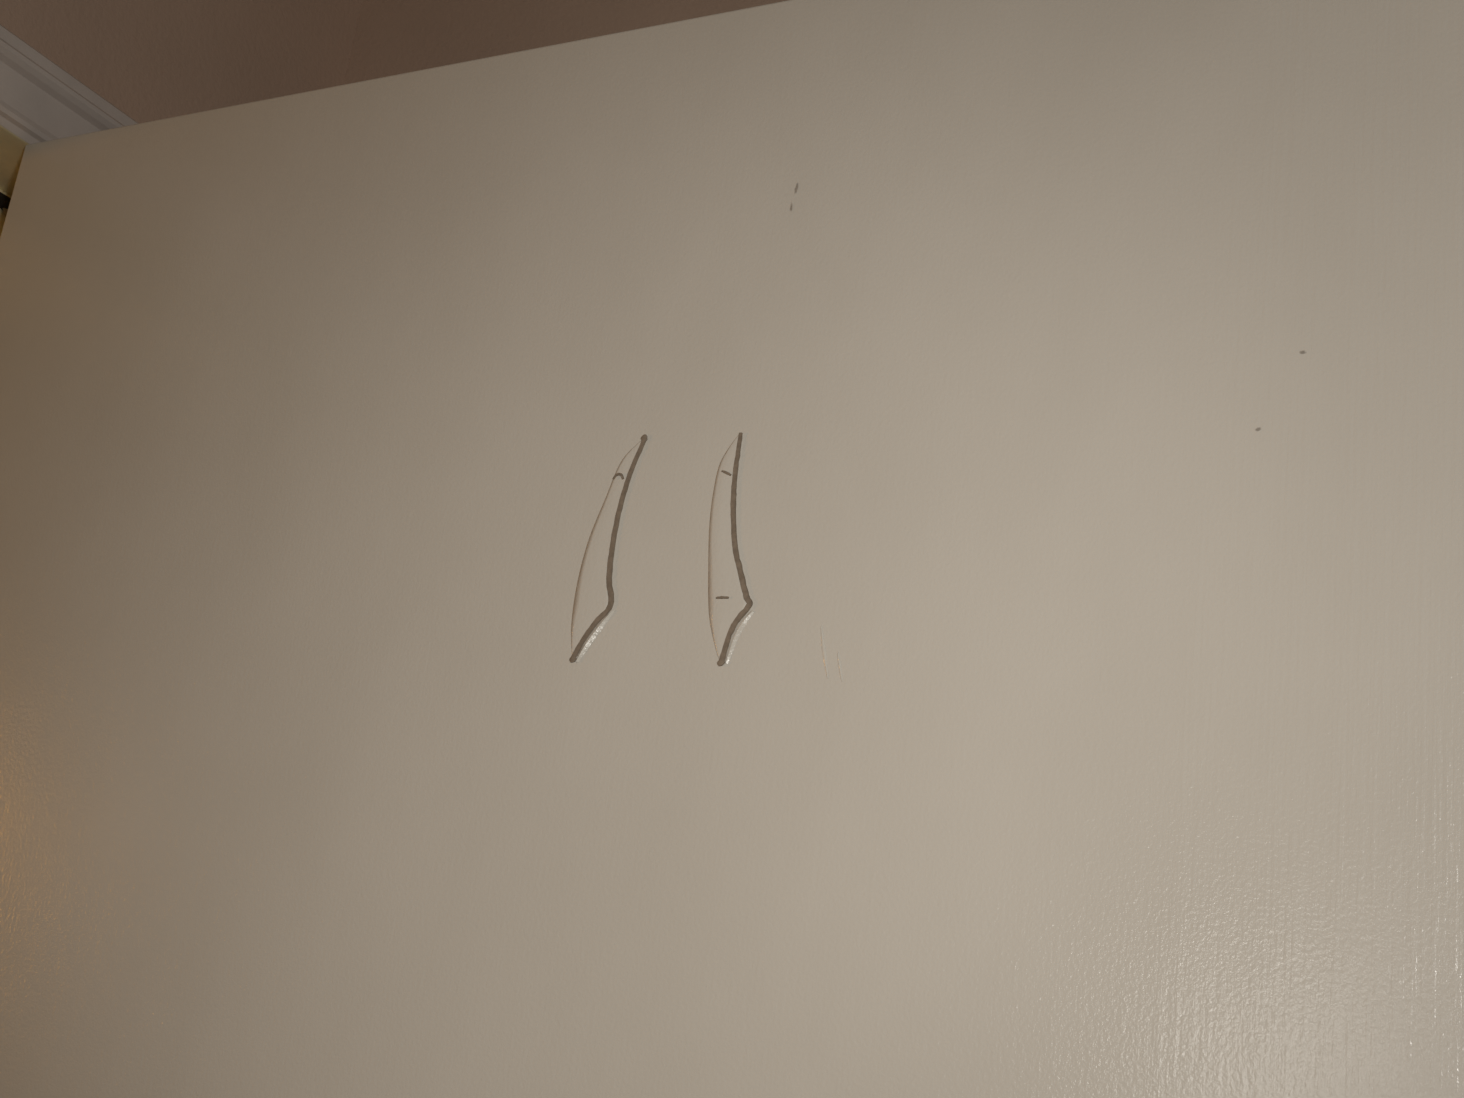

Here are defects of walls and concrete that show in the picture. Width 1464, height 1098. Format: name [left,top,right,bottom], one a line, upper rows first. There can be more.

crack [569,434,647,663]
crack [708,432,754,666]